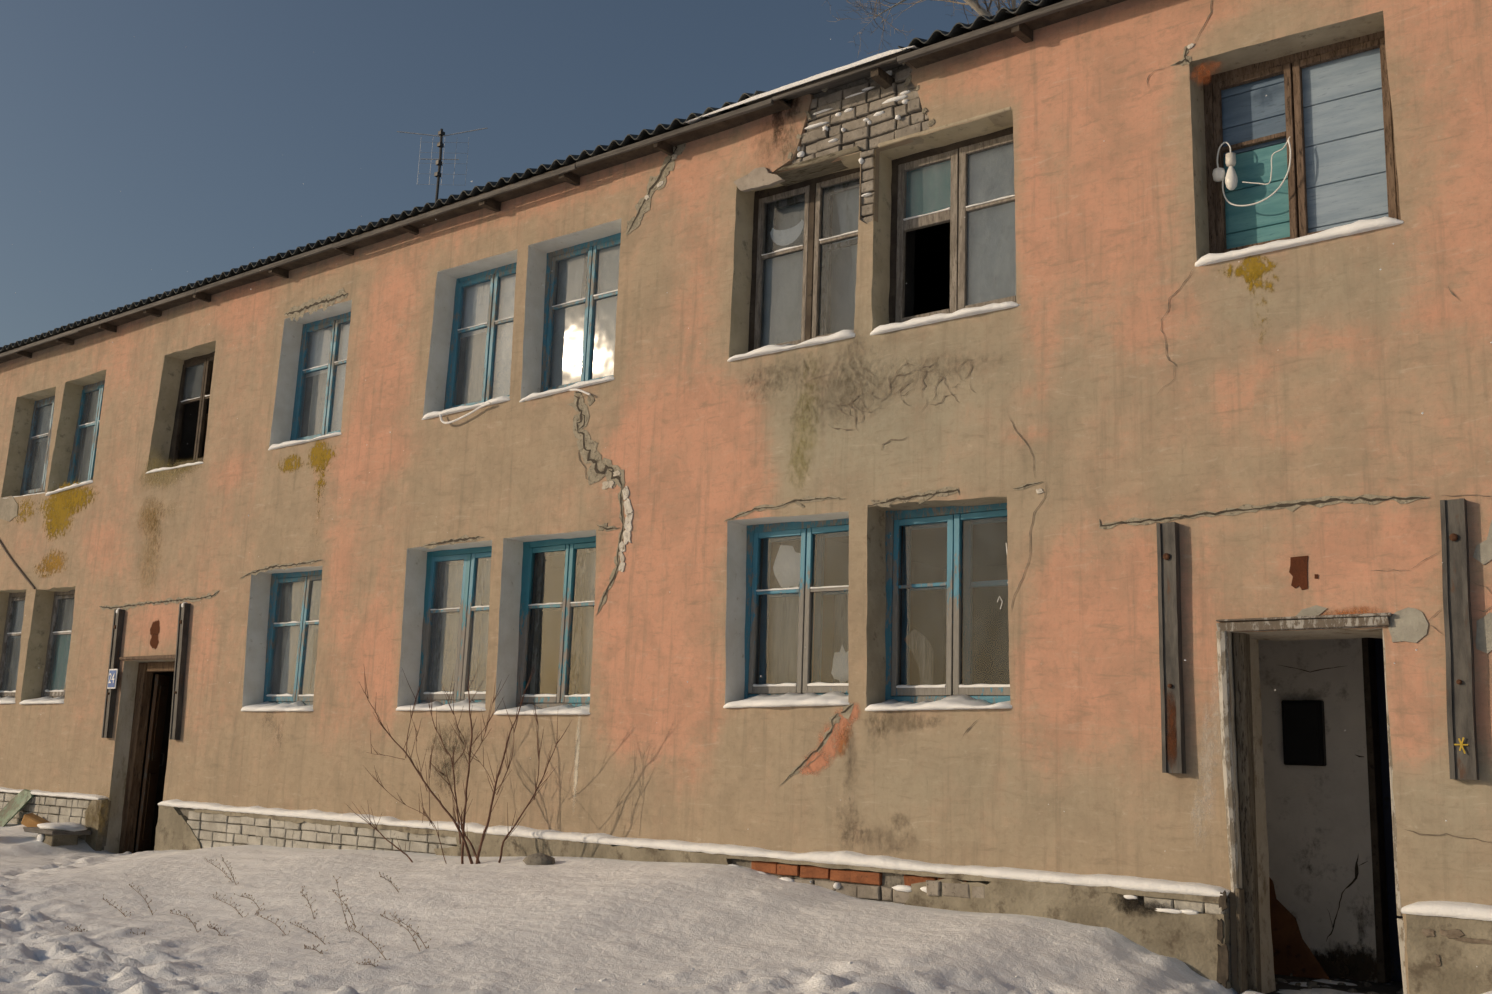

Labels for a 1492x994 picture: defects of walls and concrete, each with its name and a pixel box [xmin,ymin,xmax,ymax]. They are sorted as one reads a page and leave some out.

crack [626,143,686,235]
flaking render [734,62,1013,224]
crack [800,355,976,450]
crack [567,391,634,615]
crack [724,486,959,522]
crack [1099,494,1492,529]
rust [1289,556,1318,590]
peeling [802,705,859,774]